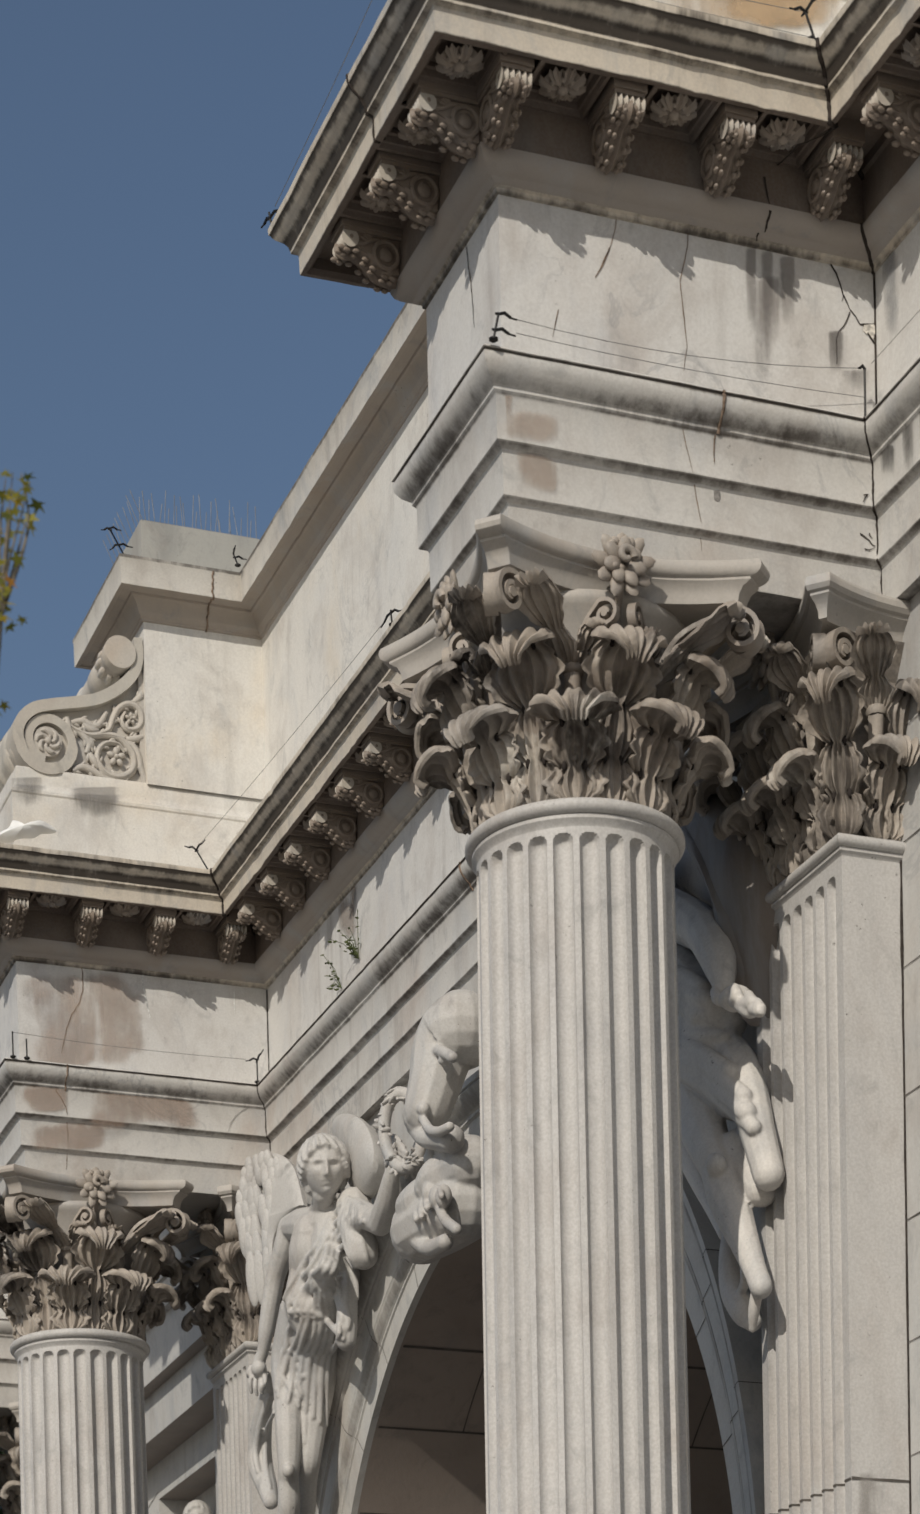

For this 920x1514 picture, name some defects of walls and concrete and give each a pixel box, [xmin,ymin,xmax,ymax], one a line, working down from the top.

crack [756,37,838,241]
crack [595,223,616,278]
crack [680,234,688,367]
crack [682,390,726,551]
crack [830,223,883,594]
crack [205,571,215,632]